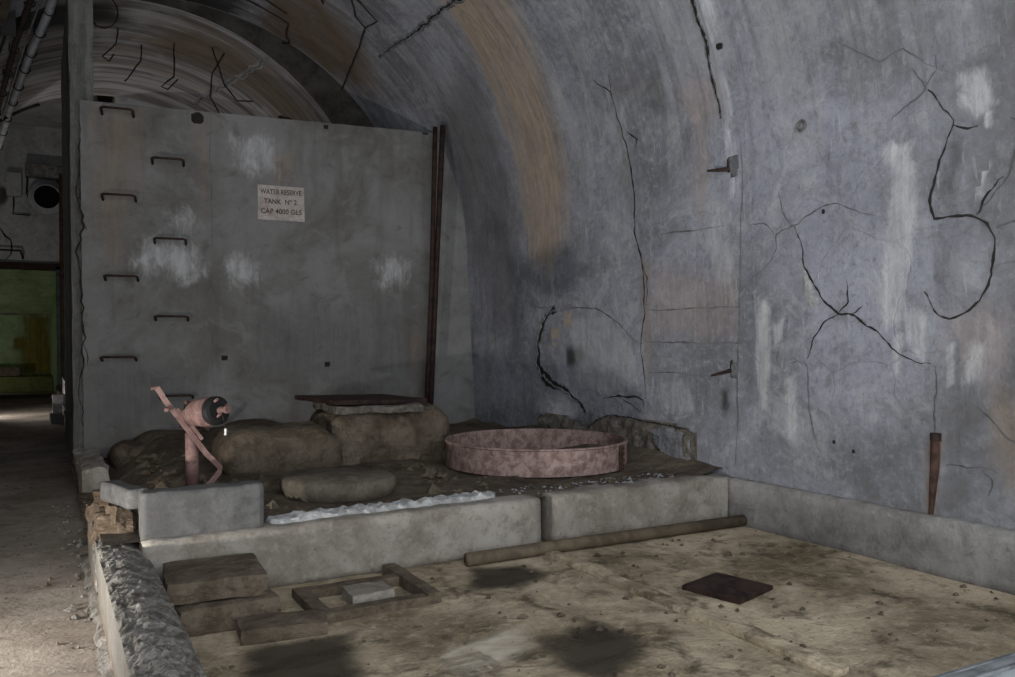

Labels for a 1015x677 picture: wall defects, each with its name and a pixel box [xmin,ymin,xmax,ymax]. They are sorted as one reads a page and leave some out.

crack [75,122,89,426]
crack [378,0,466,60]
crack [690,0,722,119]
crack [535,79,937,463]
crack [837,42,1015,320]